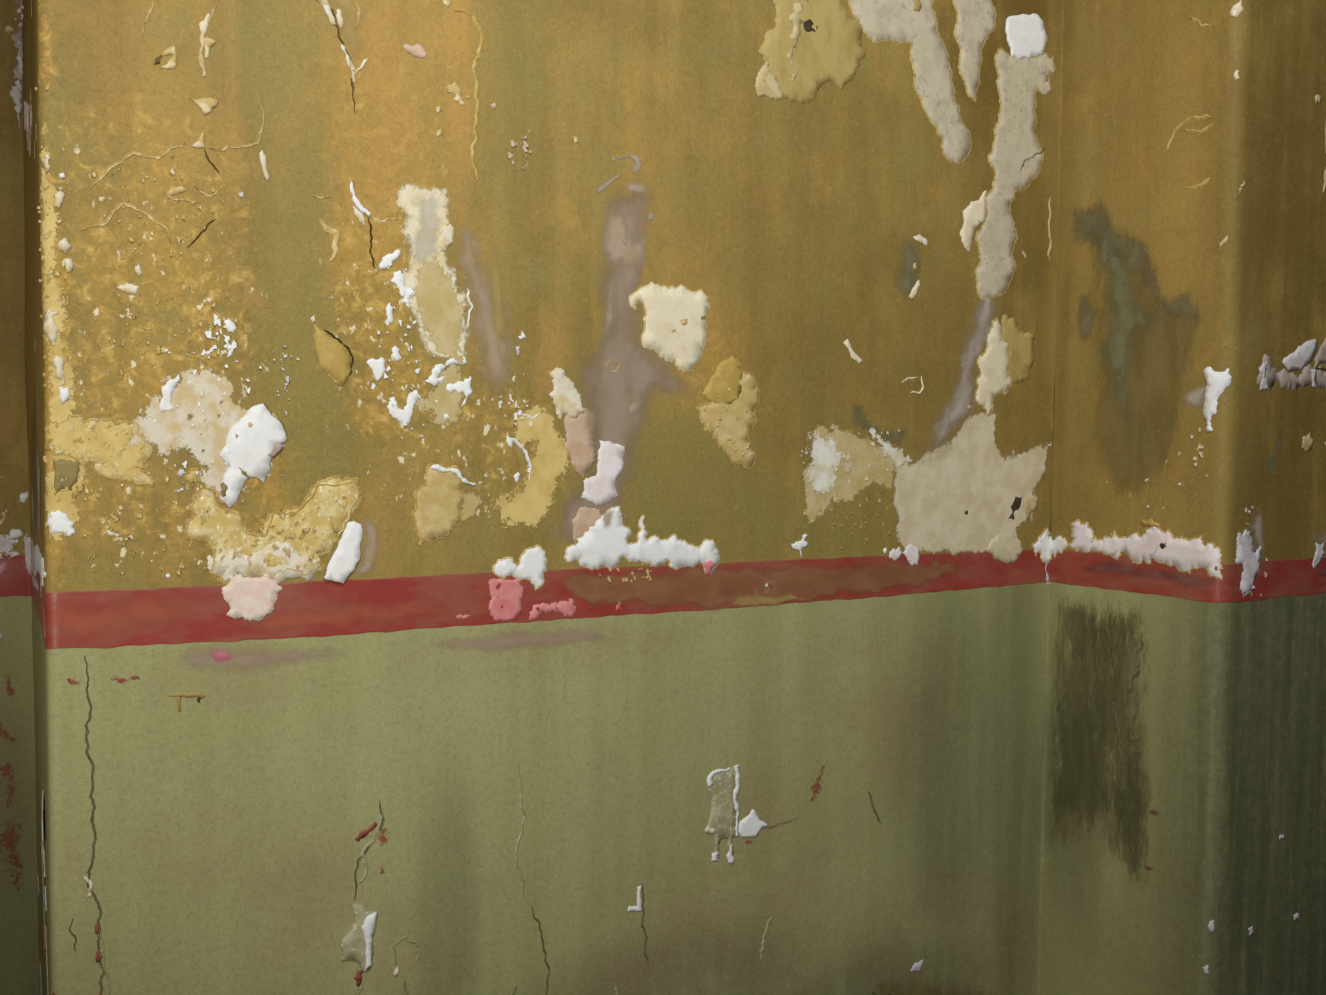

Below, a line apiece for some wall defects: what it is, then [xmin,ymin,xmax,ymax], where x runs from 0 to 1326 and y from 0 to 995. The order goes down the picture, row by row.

crack [316,0,369,112]
flaking render [755,0,1055,302]
flaking render [0,81,376,621]
flaking render [349,180,473,439]
peeling [628,281,710,373]
flaking render [411,314,1268,622]
leakage [1075,208,1199,485]
peeling [1257,338,1326,391]
crack [41,655,111,995]
peeling [341,801,387,995]
peeling [705,765,786,864]
leakage [1056,607,1158,872]